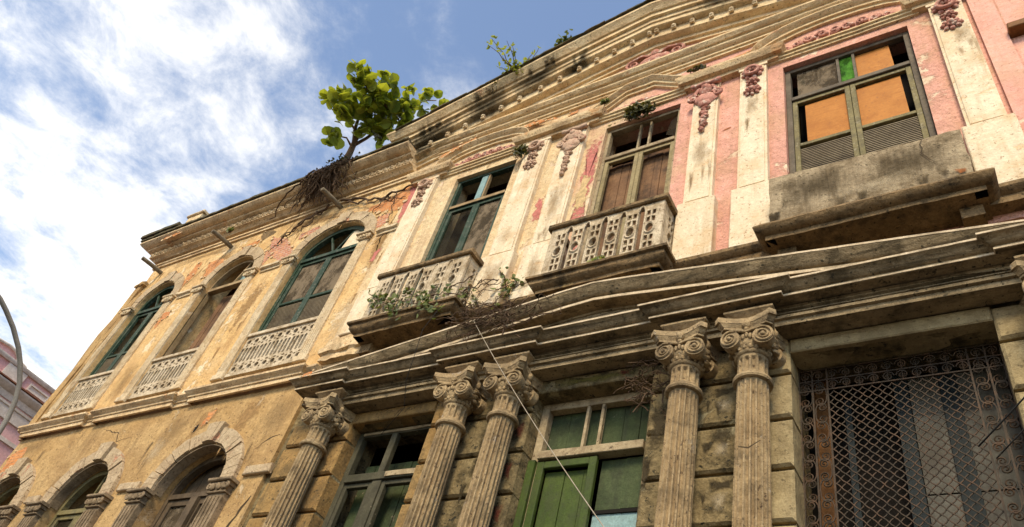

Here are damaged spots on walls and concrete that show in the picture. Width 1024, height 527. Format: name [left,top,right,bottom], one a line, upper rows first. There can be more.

damp [884,151,927,184]
damp [798,174,834,198]
spalling [242,214,343,265]
spalling [365,186,413,266]
spalling [180,254,230,289]
peeling [176,408,222,448]
spalling [0,447,27,473]